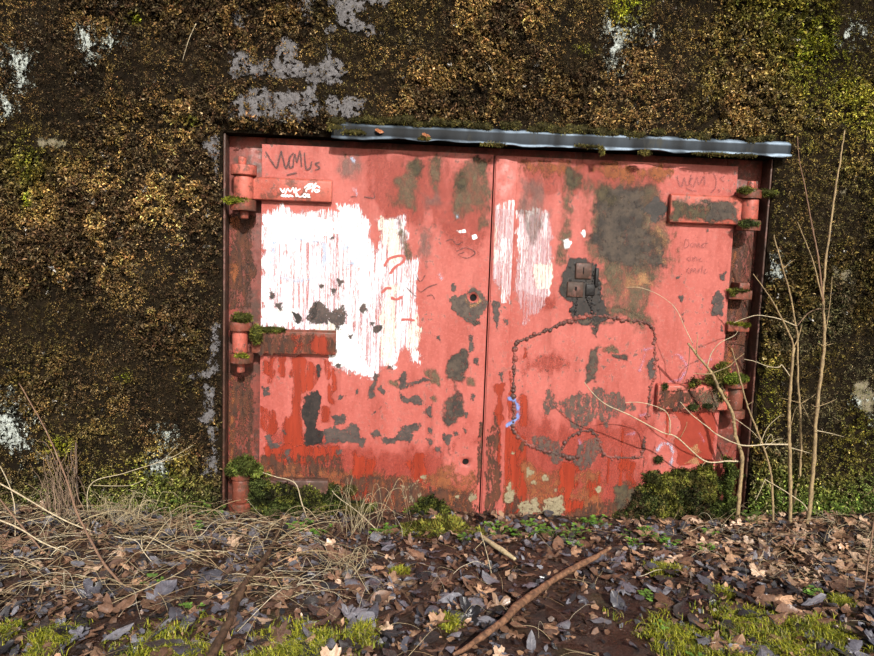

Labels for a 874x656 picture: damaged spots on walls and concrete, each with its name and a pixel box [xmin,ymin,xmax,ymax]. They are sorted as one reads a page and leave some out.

peeling [324,0,389,37]
peeling [227,36,367,125]
rust [229,214,258,312]
peeling [269,278,353,339]
peeling [359,303,383,333]
peeling [302,365,468,460]
rust [228,330,636,517]
peeling [531,435,602,471]
peeling [543,385,636,429]